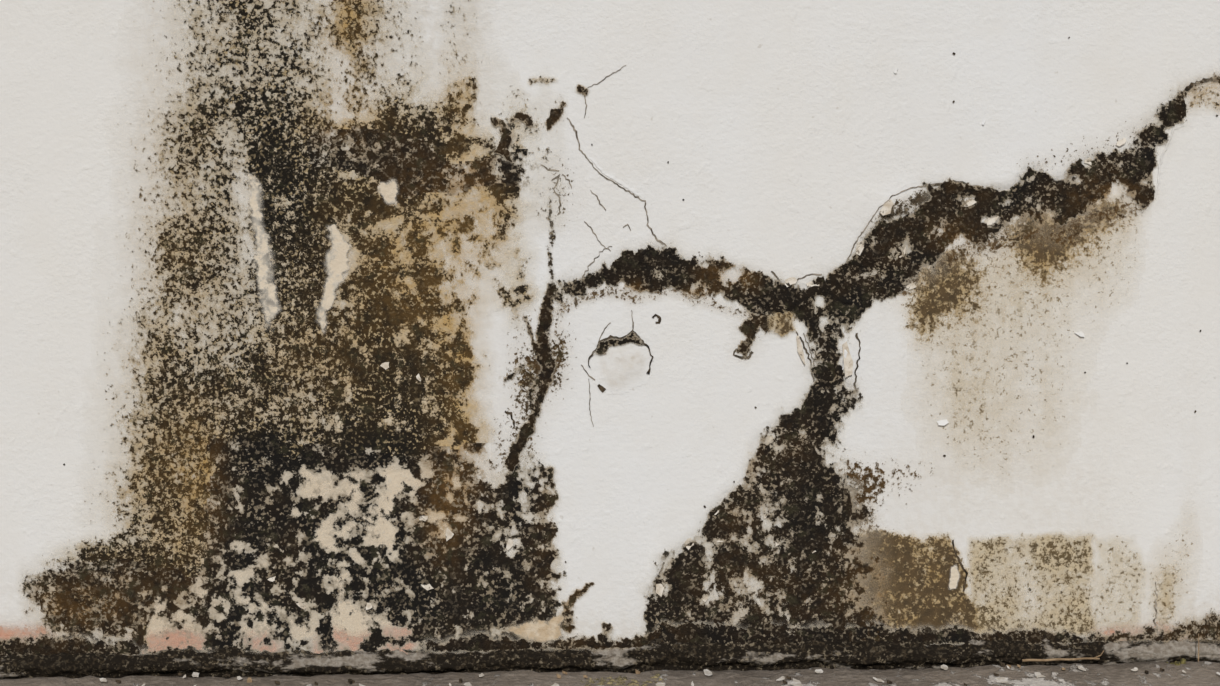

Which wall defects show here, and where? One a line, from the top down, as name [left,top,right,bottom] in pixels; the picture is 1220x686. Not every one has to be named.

crack [491,65,1220,489]
damp [901,196,1137,474]